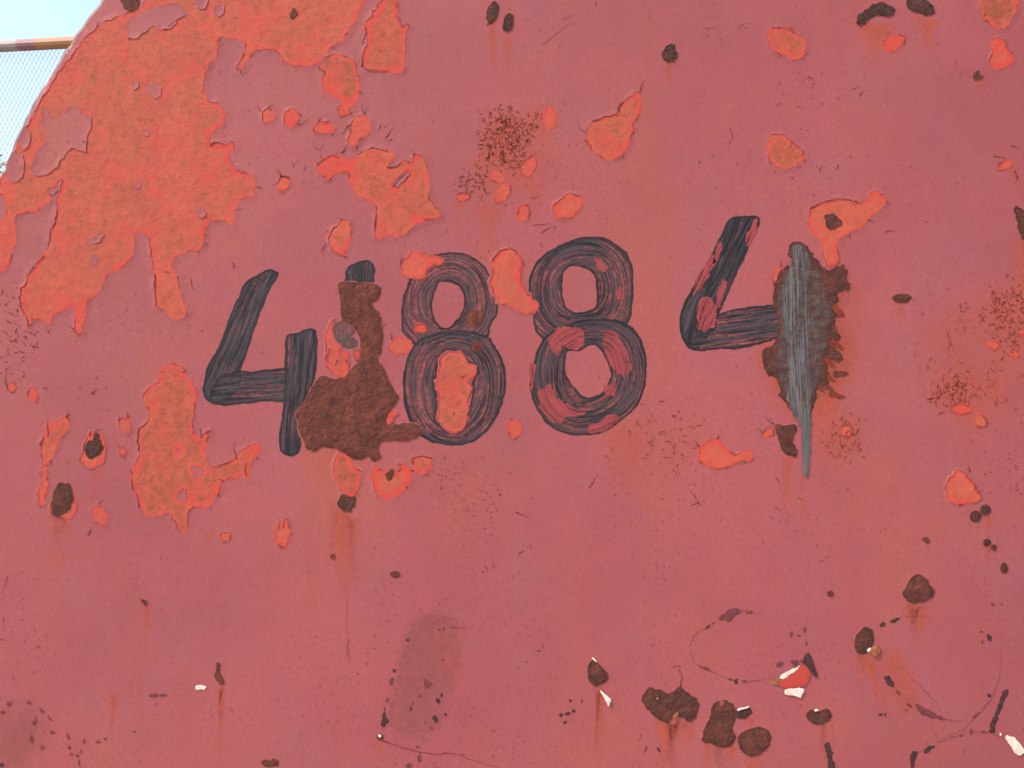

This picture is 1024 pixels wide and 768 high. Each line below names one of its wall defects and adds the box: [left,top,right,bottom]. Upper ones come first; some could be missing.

peeling [578,81,647,166]
peeling [0,0,447,342]
peeling [803,186,893,270]
peeling [484,245,539,317]
rust [295,280,423,463]
peeling [433,350,477,435]
rust [762,241,851,459]
peeling [77,359,264,538]
rust [50,481,74,524]
rust [901,572,936,630]
peeling [771,627,818,698]
rust [640,670,773,764]